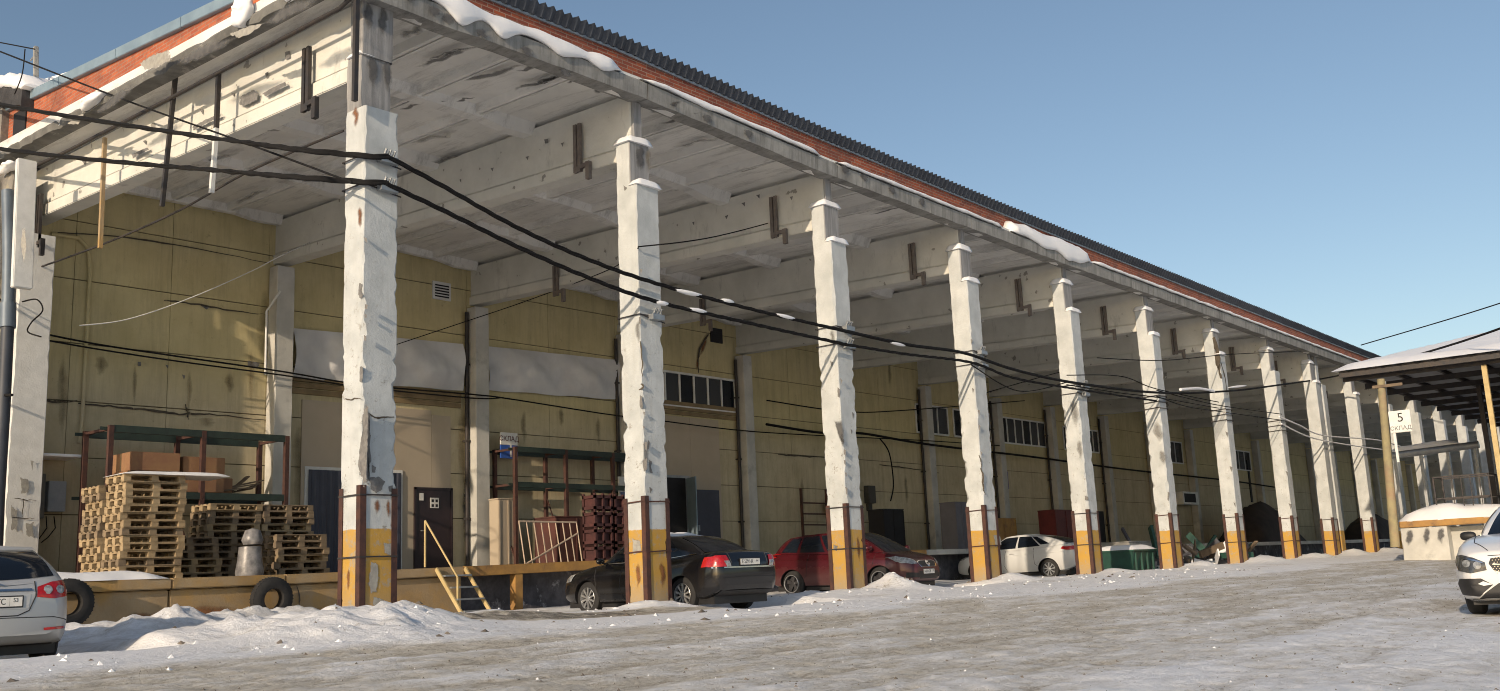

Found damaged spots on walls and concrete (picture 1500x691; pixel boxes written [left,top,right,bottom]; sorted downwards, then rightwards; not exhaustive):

crack [637,341,645,390]
spalling [358,404,393,493]
peeling [640,396,653,493]